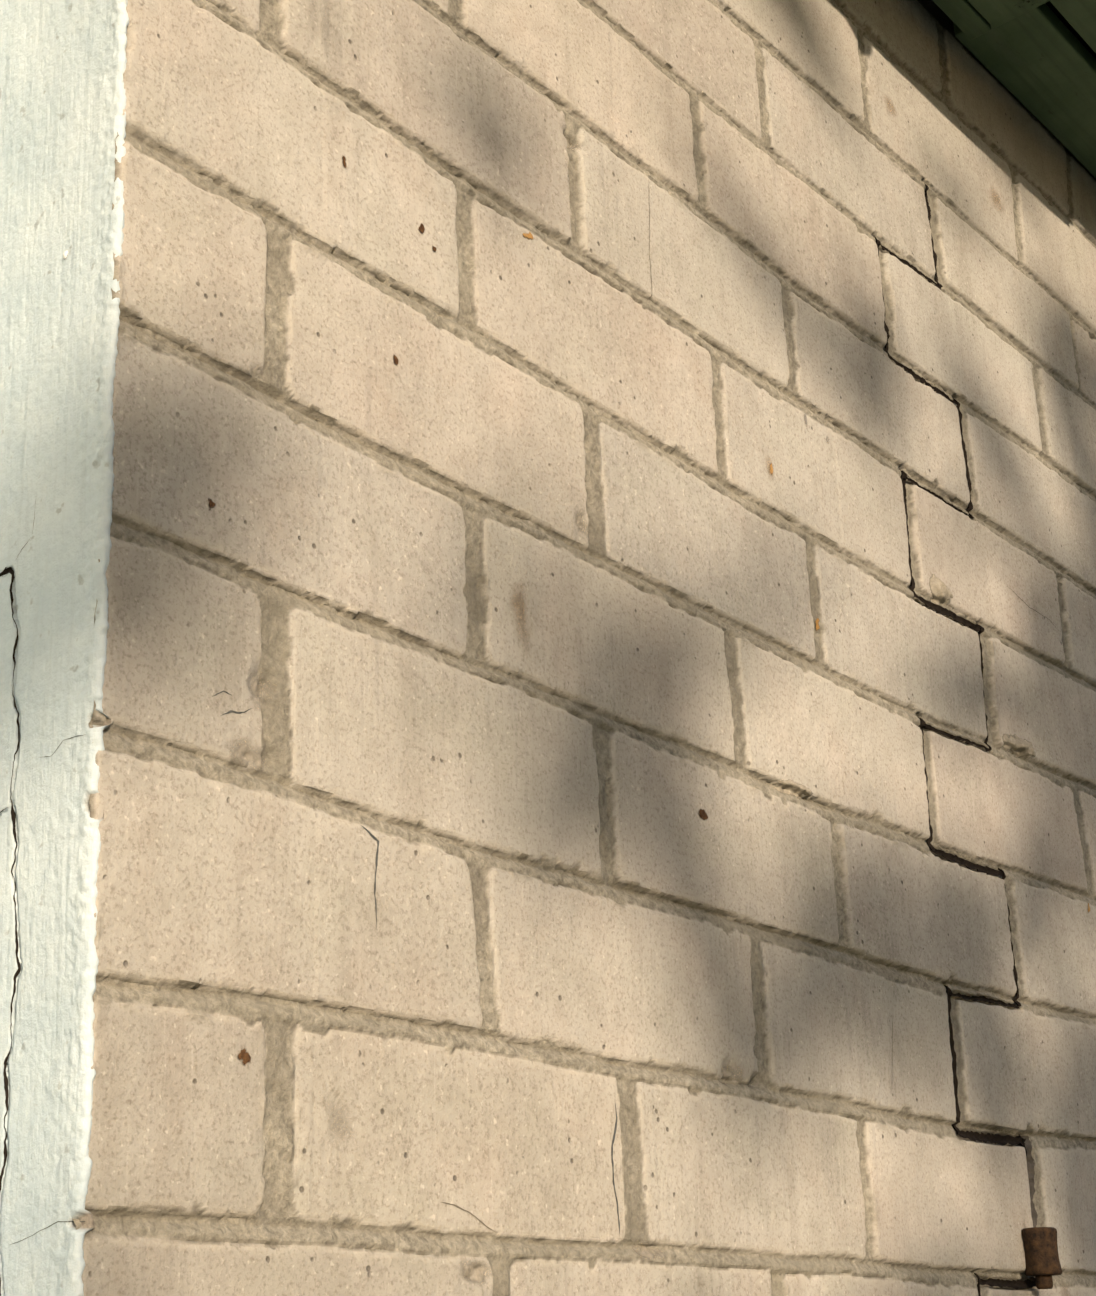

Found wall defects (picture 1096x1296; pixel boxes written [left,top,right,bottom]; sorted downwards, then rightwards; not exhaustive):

crack [873,184,943,290]
crack [882,289,1038,1227]
crack [0,501,83,1191]
crack [10,1221,85,1245]
crack [974,1273,1036,1296]